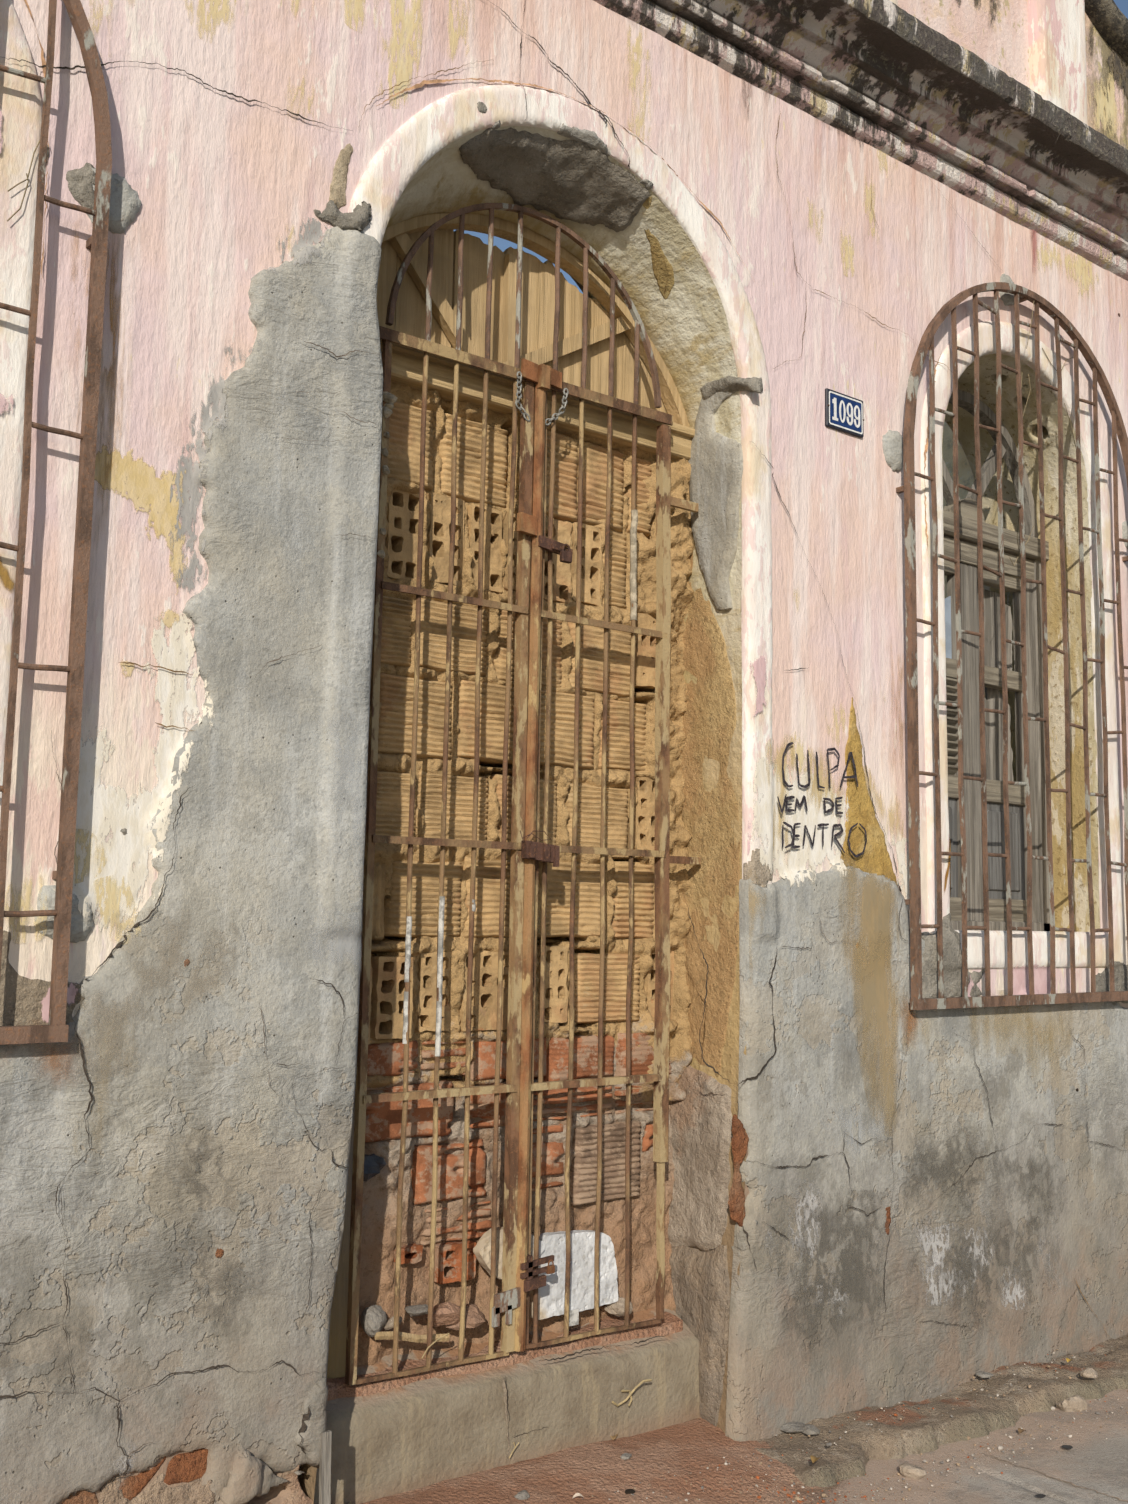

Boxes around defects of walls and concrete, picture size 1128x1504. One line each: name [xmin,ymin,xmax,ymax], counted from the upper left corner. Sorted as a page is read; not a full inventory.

crack [3,4,630,169]
leakage [958,0,1001,25]
mould [1089,23,1128,97]
crack [775,100,953,373]
peeling [94,444,188,593]
peeling [54,609,215,941]
spalling [0,881,84,1026]
crack [0,979,361,1489]
leakage [791,1186,879,1333]
crack [743,1018,968,1327]
leakage [916,1223,1051,1310]
spalling [62,1377,328,1504]